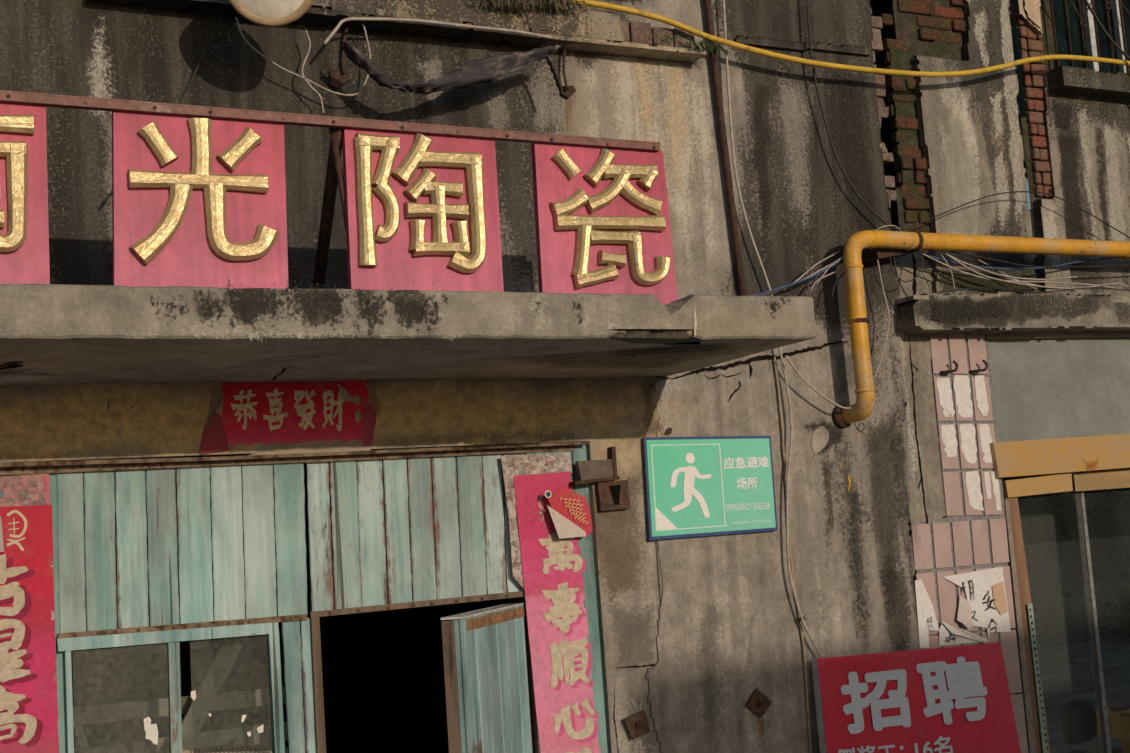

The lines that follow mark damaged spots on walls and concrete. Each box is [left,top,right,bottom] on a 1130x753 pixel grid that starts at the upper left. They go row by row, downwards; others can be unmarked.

spalling [870,0,1056,238]
water stain [1053,101,1130,242]
water stain [150,279,449,338]
crack [614,664,656,753]